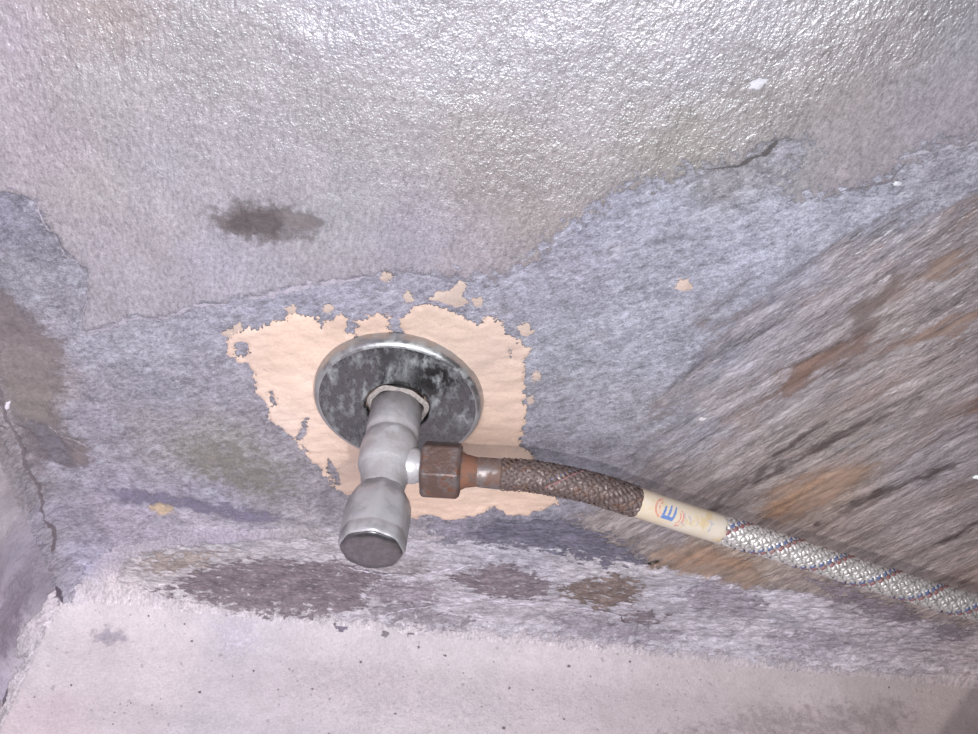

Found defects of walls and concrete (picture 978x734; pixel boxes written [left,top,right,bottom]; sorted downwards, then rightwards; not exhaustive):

damp [212,199,323,242]
crack [0,389,57,554]
damp [0,290,94,467]
spalling [0,129,978,678]